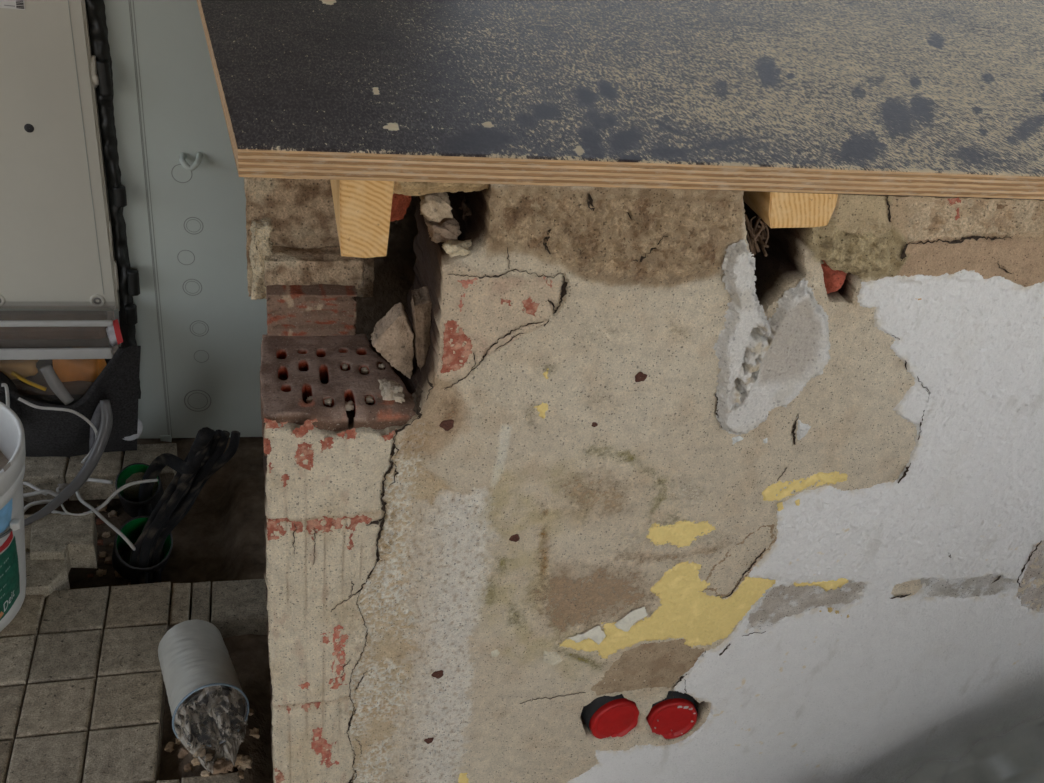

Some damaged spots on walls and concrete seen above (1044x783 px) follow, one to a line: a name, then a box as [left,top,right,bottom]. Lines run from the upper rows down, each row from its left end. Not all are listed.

flaking render [497,194,739,285]
crack [631,236,668,263]
flaking render [817,229,894,294]
flaking render [796,417,811,440]
crack [331,220,568,783]
peeling [762,471,848,511]
peeling [543,520,865,696]
flaking render [920,540,1044,613]